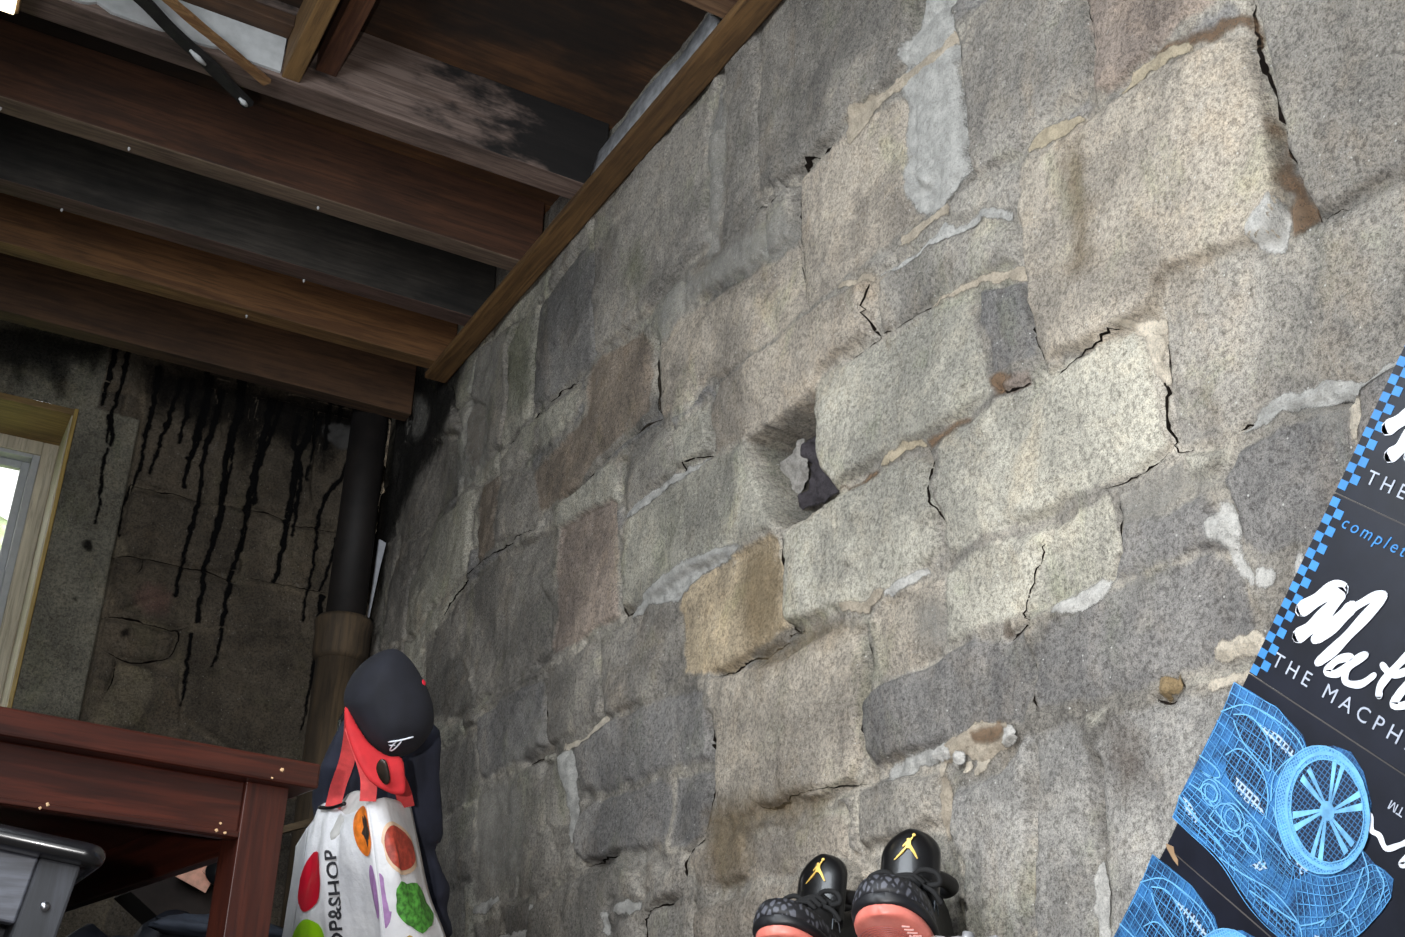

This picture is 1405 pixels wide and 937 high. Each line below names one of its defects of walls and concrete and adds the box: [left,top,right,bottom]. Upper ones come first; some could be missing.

crack [1252,5,1298,164]
leakage [0,329,131,524]
leakage [118,366,353,707]
spalling [780,436,839,510]
leakage [300,658,315,730]